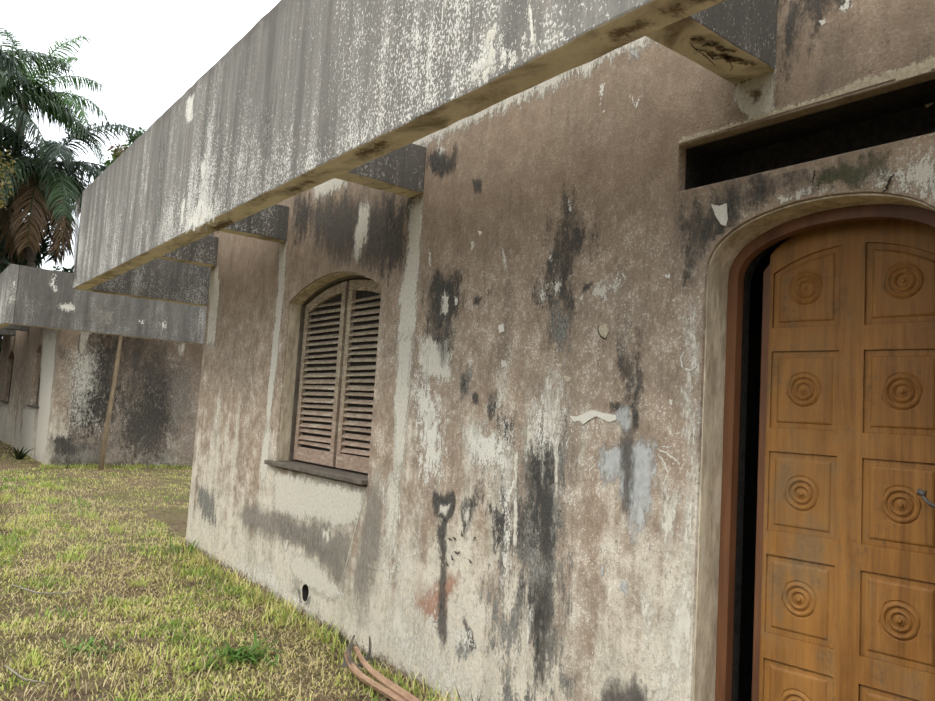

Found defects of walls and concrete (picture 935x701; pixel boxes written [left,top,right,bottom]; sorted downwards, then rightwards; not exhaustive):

water stain [355,141,388,157]
water stain [413,20,661,147]
water stain [679,0,935,143]
peeling [679,148,935,286]
water stain [21,329,188,469]
water stain [240,178,598,701]
peeling [570,404,657,542]
water stain [610,337,643,430]
water stain [658,299,700,701]
water stain [181,539,448,701]
water stain [602,678,646,701]